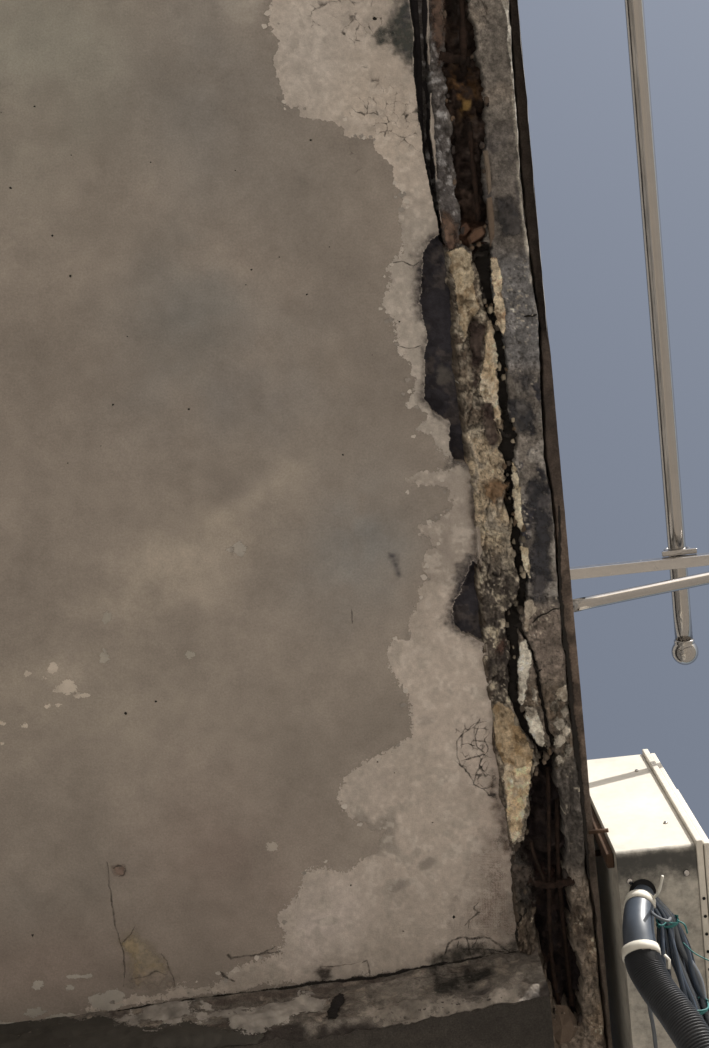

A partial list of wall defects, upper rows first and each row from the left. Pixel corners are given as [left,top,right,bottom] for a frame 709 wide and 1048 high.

corrosion [439,209,459,251]
peeling [23,0,582,1035]
crack [472,251,590,878]
crack [459,719,495,796]
crack [111,894,527,1011]